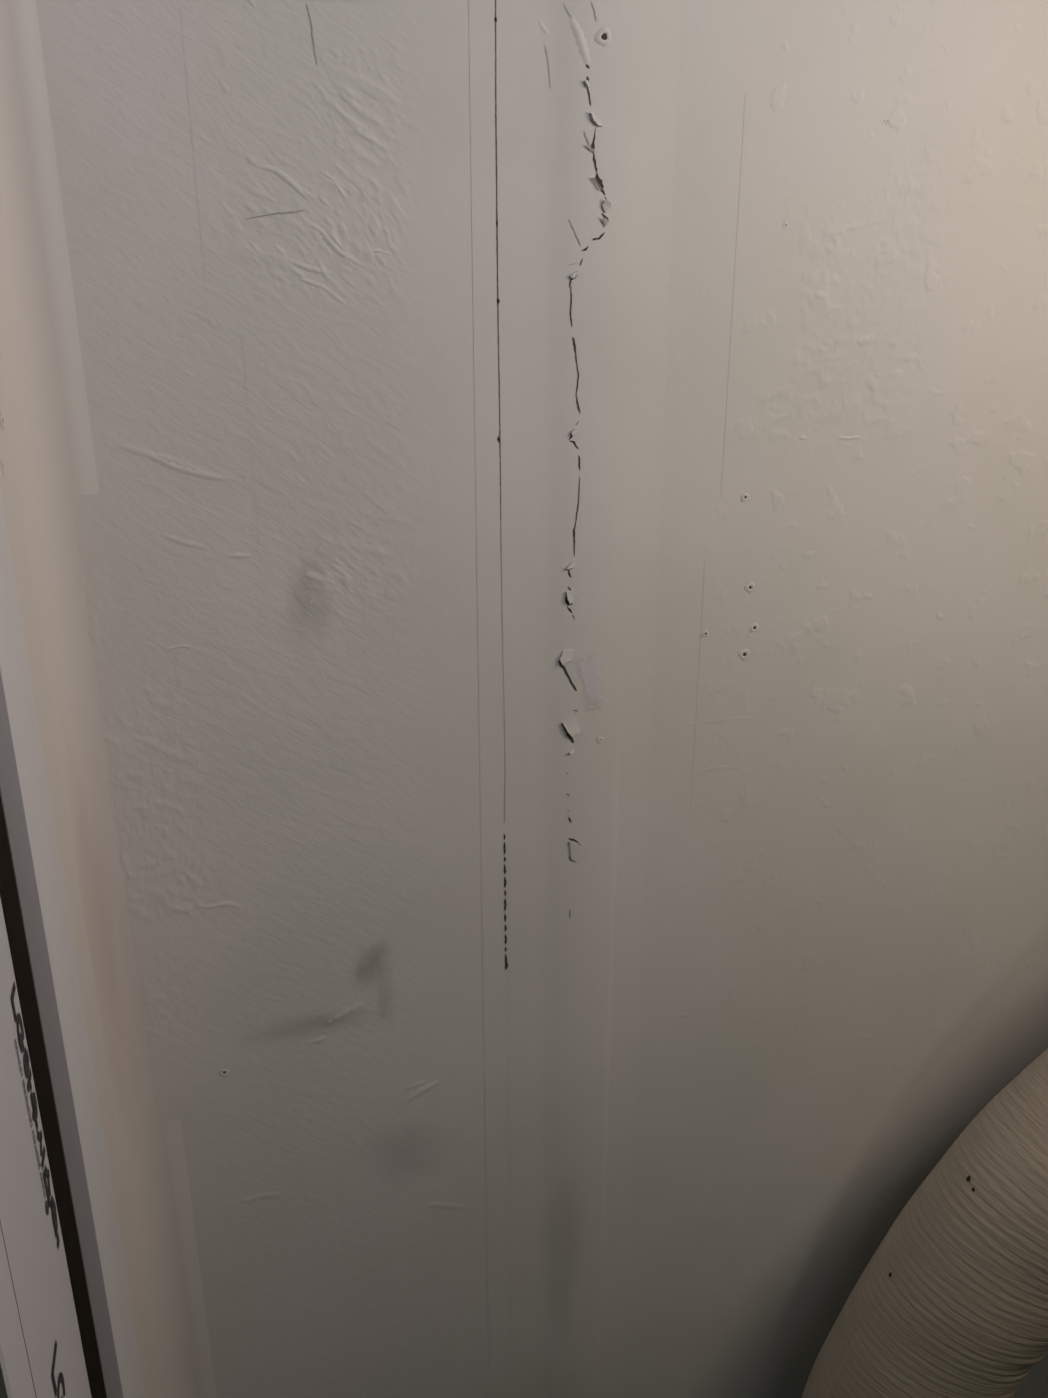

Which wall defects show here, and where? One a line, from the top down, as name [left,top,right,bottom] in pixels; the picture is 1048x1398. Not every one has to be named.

crack [538,2,611,862]